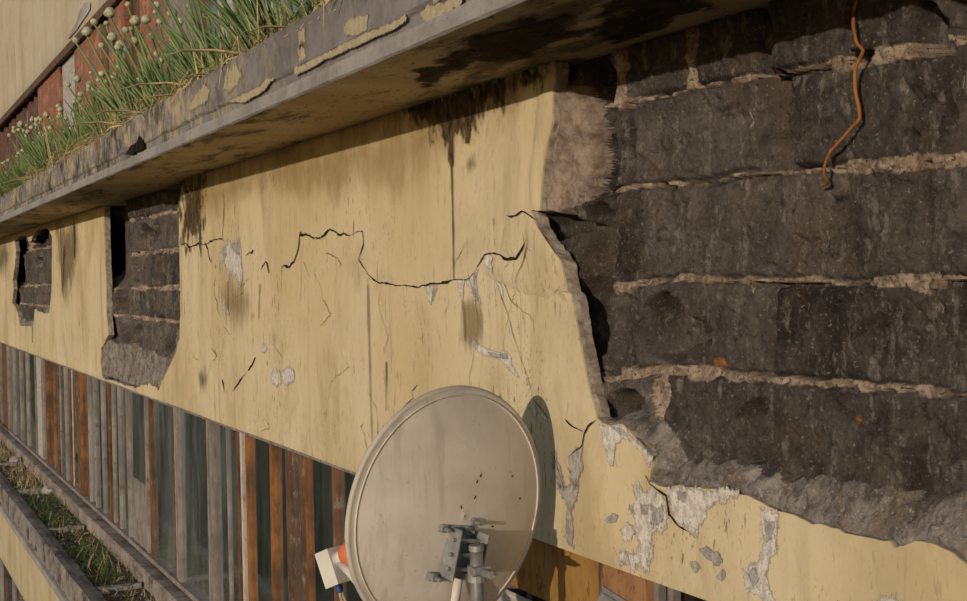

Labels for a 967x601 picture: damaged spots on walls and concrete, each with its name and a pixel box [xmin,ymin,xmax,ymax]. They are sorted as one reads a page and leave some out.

peeling [188,83,210,112]
peeling [223,63,274,104]
peeling [294,13,407,75]
peeling [420,0,462,22]
damp [401,0,716,278]
corrosion [820,0,865,187]
spalling [17,229,52,331]
spalling [102,184,183,388]
peeling [220,236,243,289]
crack [193,210,594,488]
spalling [543,0,967,601]